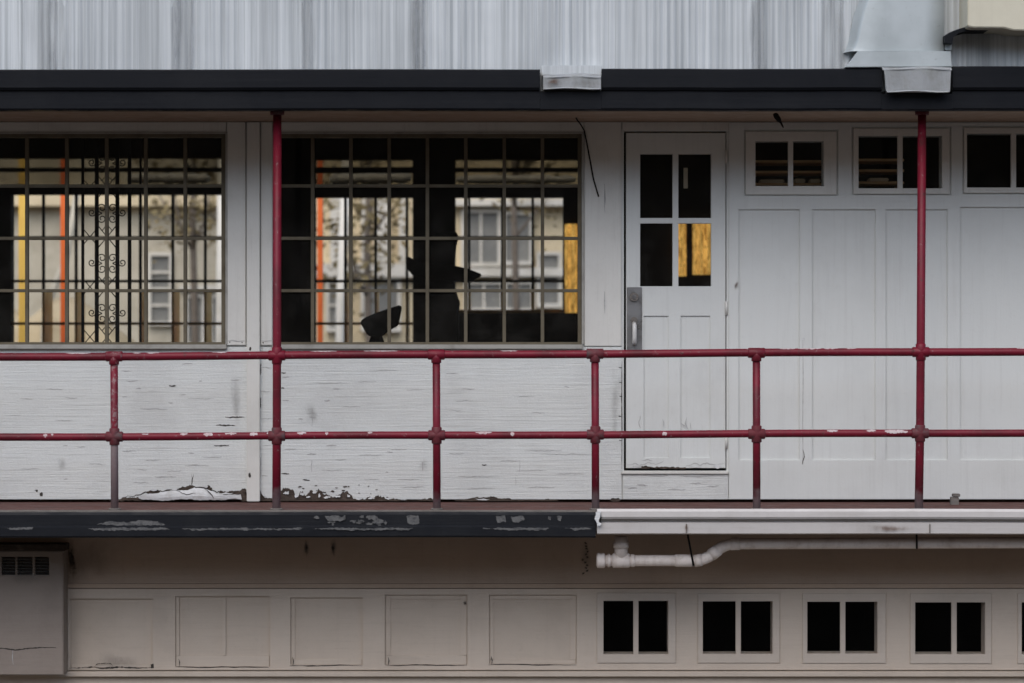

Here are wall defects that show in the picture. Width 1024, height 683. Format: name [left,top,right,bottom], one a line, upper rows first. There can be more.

peeling [119,473,251,502]
peeling [260,485,433,501]
peeling [89,520,302,531]
peeling [314,515,420,531]
peeling [483,511,602,531]
crack [0,647,56,661]